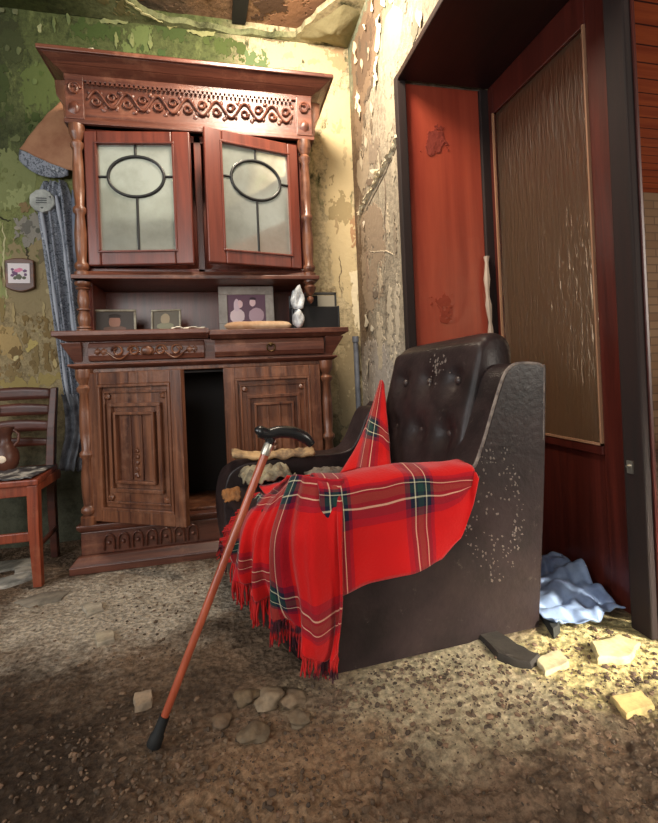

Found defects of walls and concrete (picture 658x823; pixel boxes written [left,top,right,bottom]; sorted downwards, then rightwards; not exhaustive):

flaking render [251,0,289,21]
leakage [70,17,121,46]
peeling [100,18,134,49]
peeling [187,29,215,37]
leakage [203,36,246,63]
leakage [0,17,42,133]
leakage [0,134,37,213]
flaking render [266,0,393,332]
leakage [0,238,61,388]